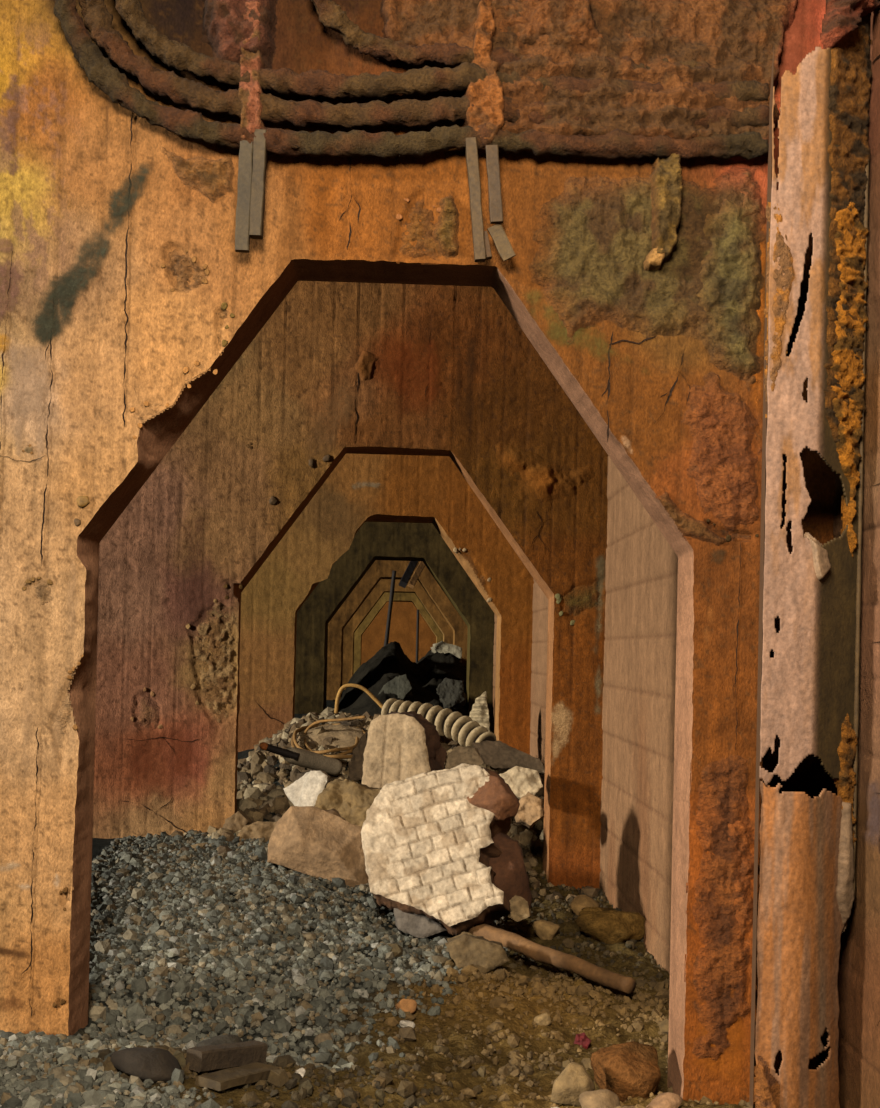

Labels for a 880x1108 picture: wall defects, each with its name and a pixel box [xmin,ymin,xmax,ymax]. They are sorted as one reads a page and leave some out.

damp [35,166,148,343]
spalling [161,249,210,293]
spalling [395,190,455,265]
corrosion [380,0,880,558]
spalling [186,579,244,723]
corrosion [833,713,858,848]